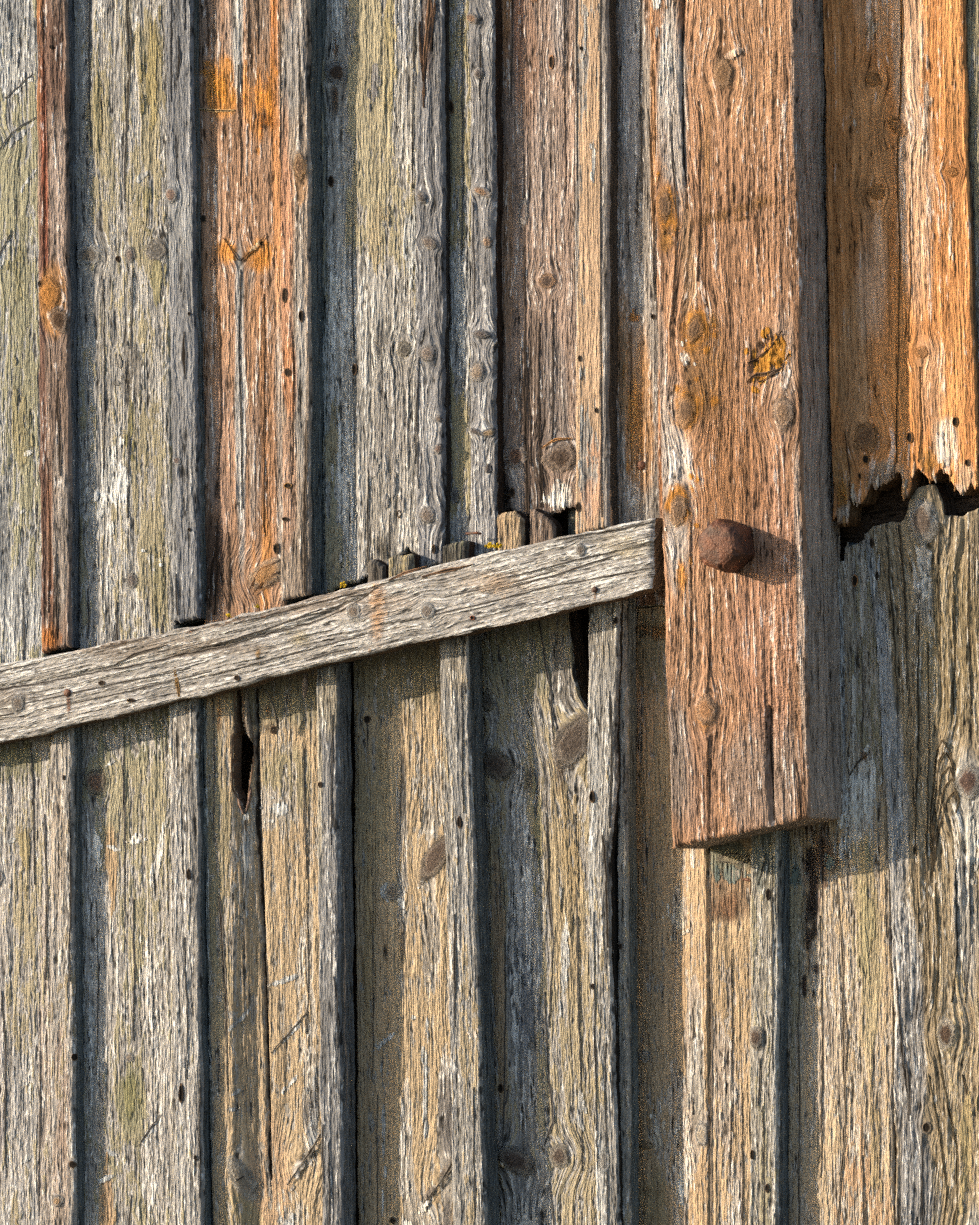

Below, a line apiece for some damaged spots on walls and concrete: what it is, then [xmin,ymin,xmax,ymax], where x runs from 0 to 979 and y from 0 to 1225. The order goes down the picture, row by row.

crack [0,0,654,1225]
crack [638,0,708,324]